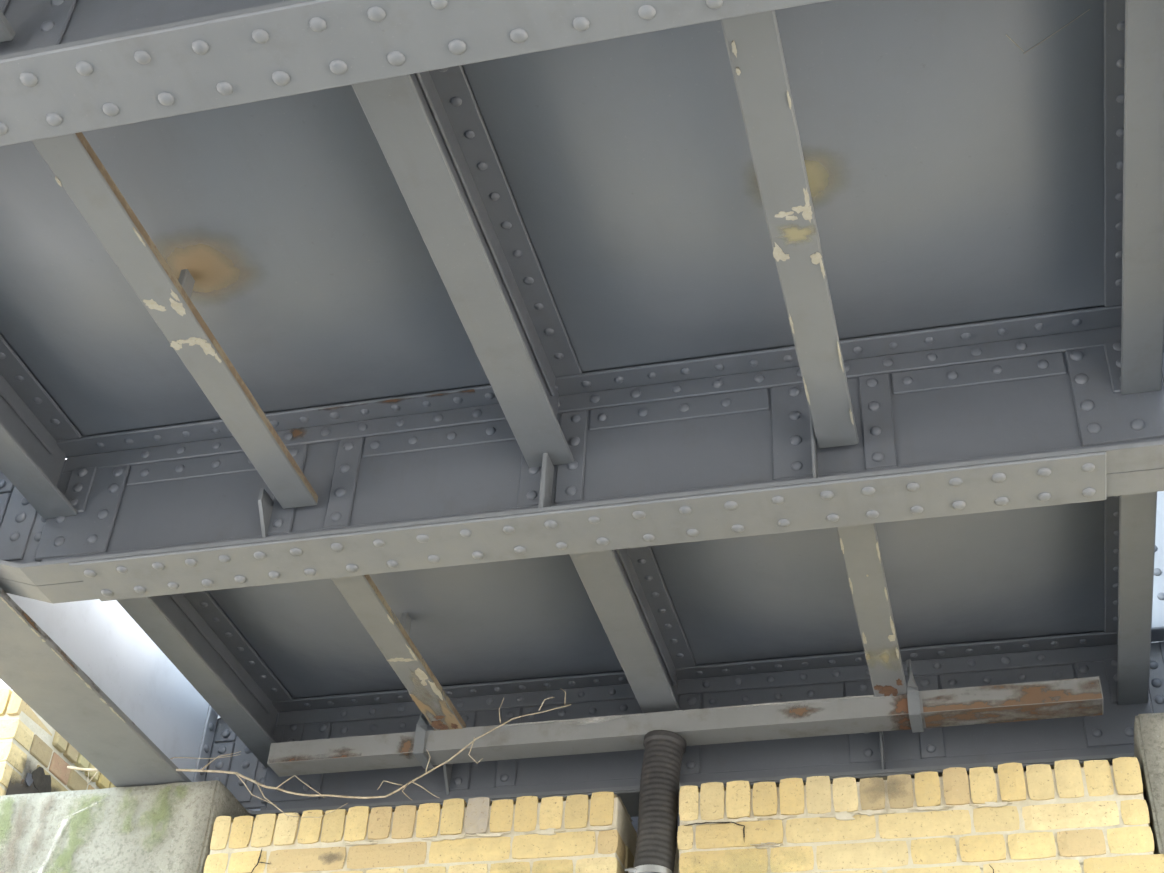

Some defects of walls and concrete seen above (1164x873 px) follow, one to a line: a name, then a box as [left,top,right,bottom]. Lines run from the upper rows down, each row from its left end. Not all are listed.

peeling [775,188,812,223]
peeling [773,243,790,262]
peeling [810,252,825,278]
peeling [143,289,186,316]
rust [75,132,318,503]
peeling [170,337,222,363]
peeling [386,645,443,700]
peeling [431,715,458,730]
rust [786,706,815,717]
rust [891,694,911,730]
rust [923,681,1102,728]
damp [38,796,104,873]